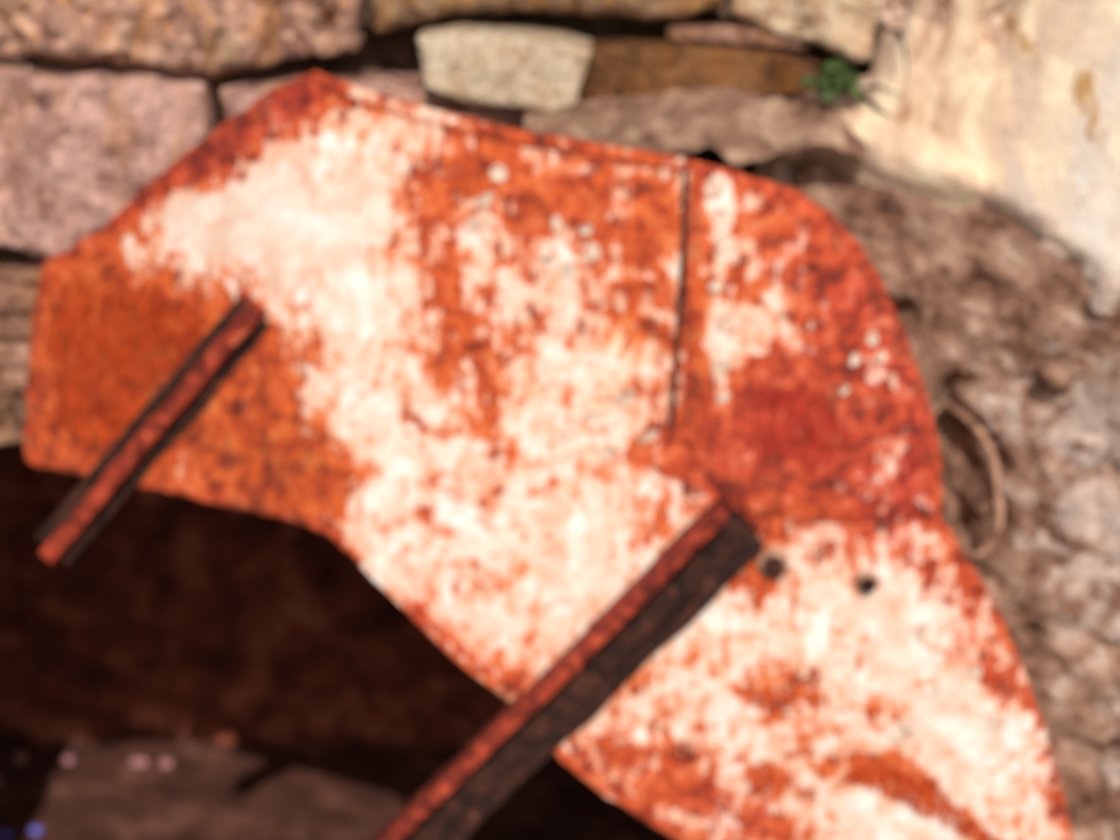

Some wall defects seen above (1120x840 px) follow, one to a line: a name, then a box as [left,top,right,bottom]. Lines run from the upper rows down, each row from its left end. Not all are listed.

rust [849,763,998,840]
spalling [792,163,1120,840]